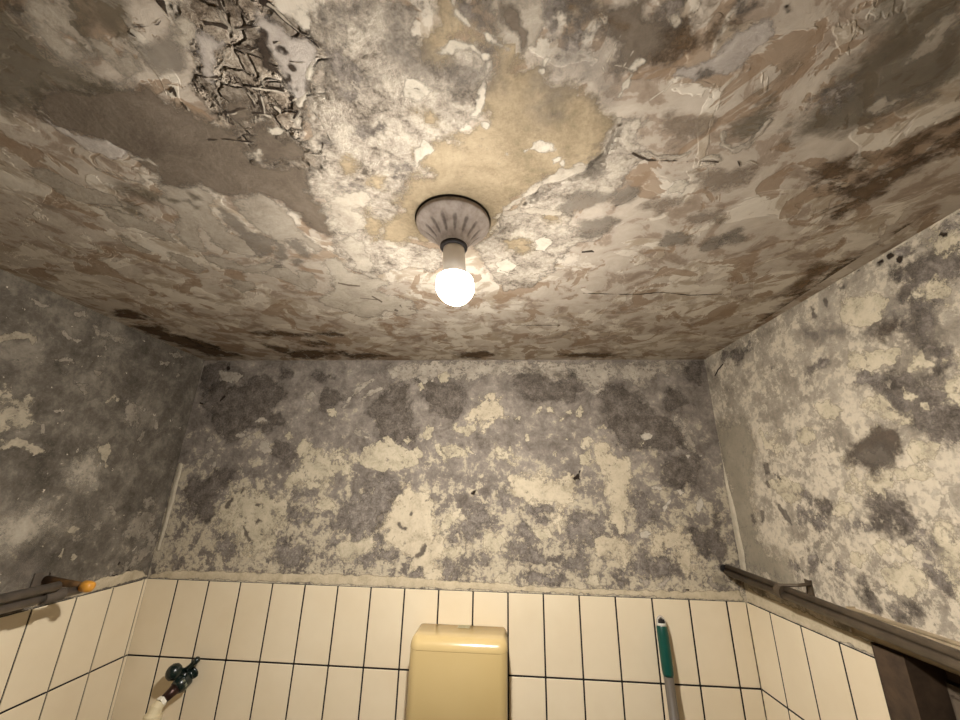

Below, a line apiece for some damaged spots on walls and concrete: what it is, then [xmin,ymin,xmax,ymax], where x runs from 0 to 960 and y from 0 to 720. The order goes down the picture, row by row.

peeling [10,0,649,319]
peeling [0,331,37,345]
peeling [0,383,46,455]
peeling [219,366,243,383]
peeling [327,378,383,417]
peeling [213,392,521,560]
damp [367,377,467,445]
damp [437,487,604,587]
damp [597,383,701,490]
damp [716,417,925,624]
damp [844,489,956,597]
damp [853,213,960,444]